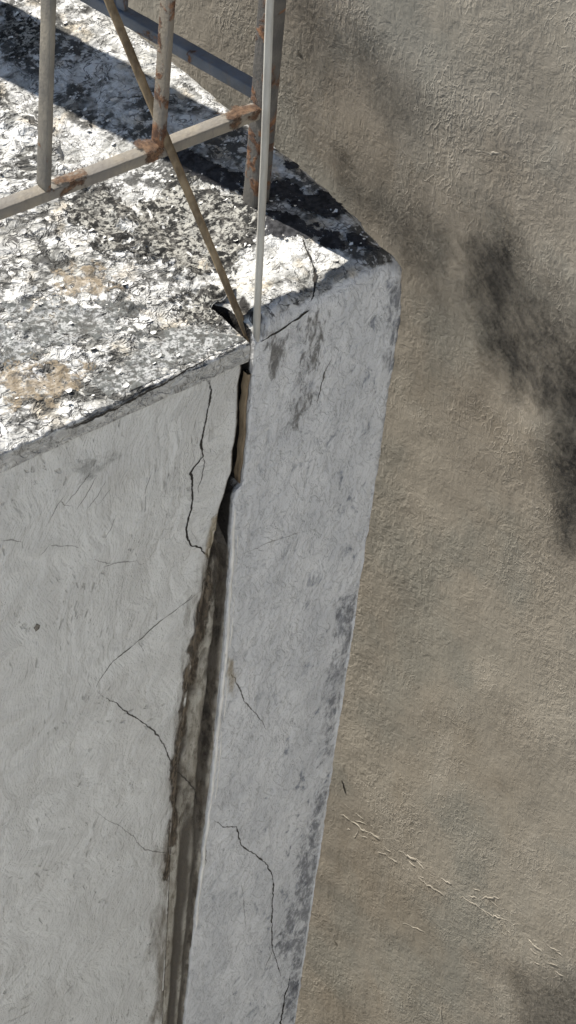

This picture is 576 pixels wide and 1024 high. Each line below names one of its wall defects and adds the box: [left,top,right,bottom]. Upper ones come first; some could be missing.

rust [51,168,87,198]
rust [133,139,164,165]
rust [217,104,262,130]
crack [261,235,317,342]
crack [96,595,196,797]
damp [163,543,226,892]
crack [231,675,266,729]
damp [151,909,168,1022]
crack [217,822,290,1024]